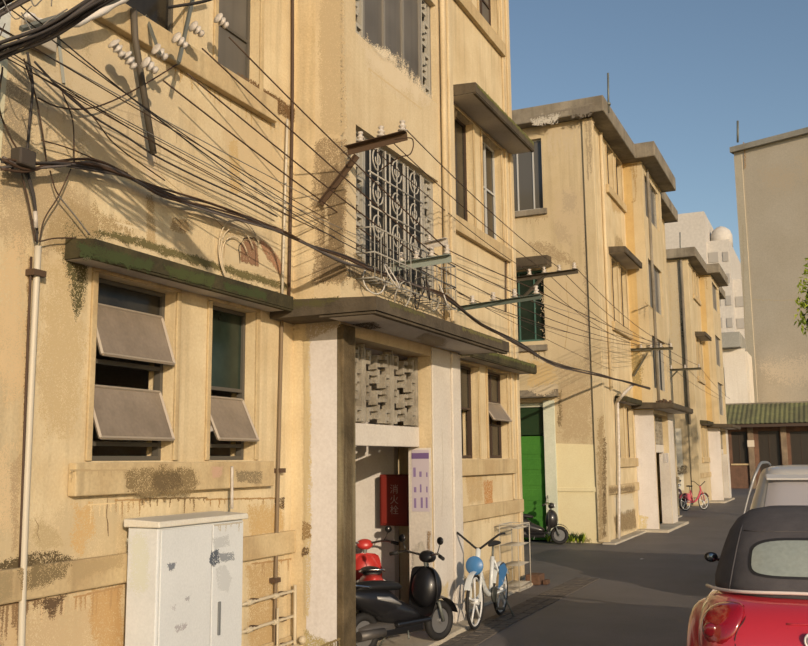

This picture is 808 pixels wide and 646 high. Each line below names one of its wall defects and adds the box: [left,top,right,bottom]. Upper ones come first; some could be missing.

damp [529,103,593,181]
damp [0,160,159,443]
flaking render [211,229,287,281]
damp [526,186,649,543]
damp [0,454,207,646]